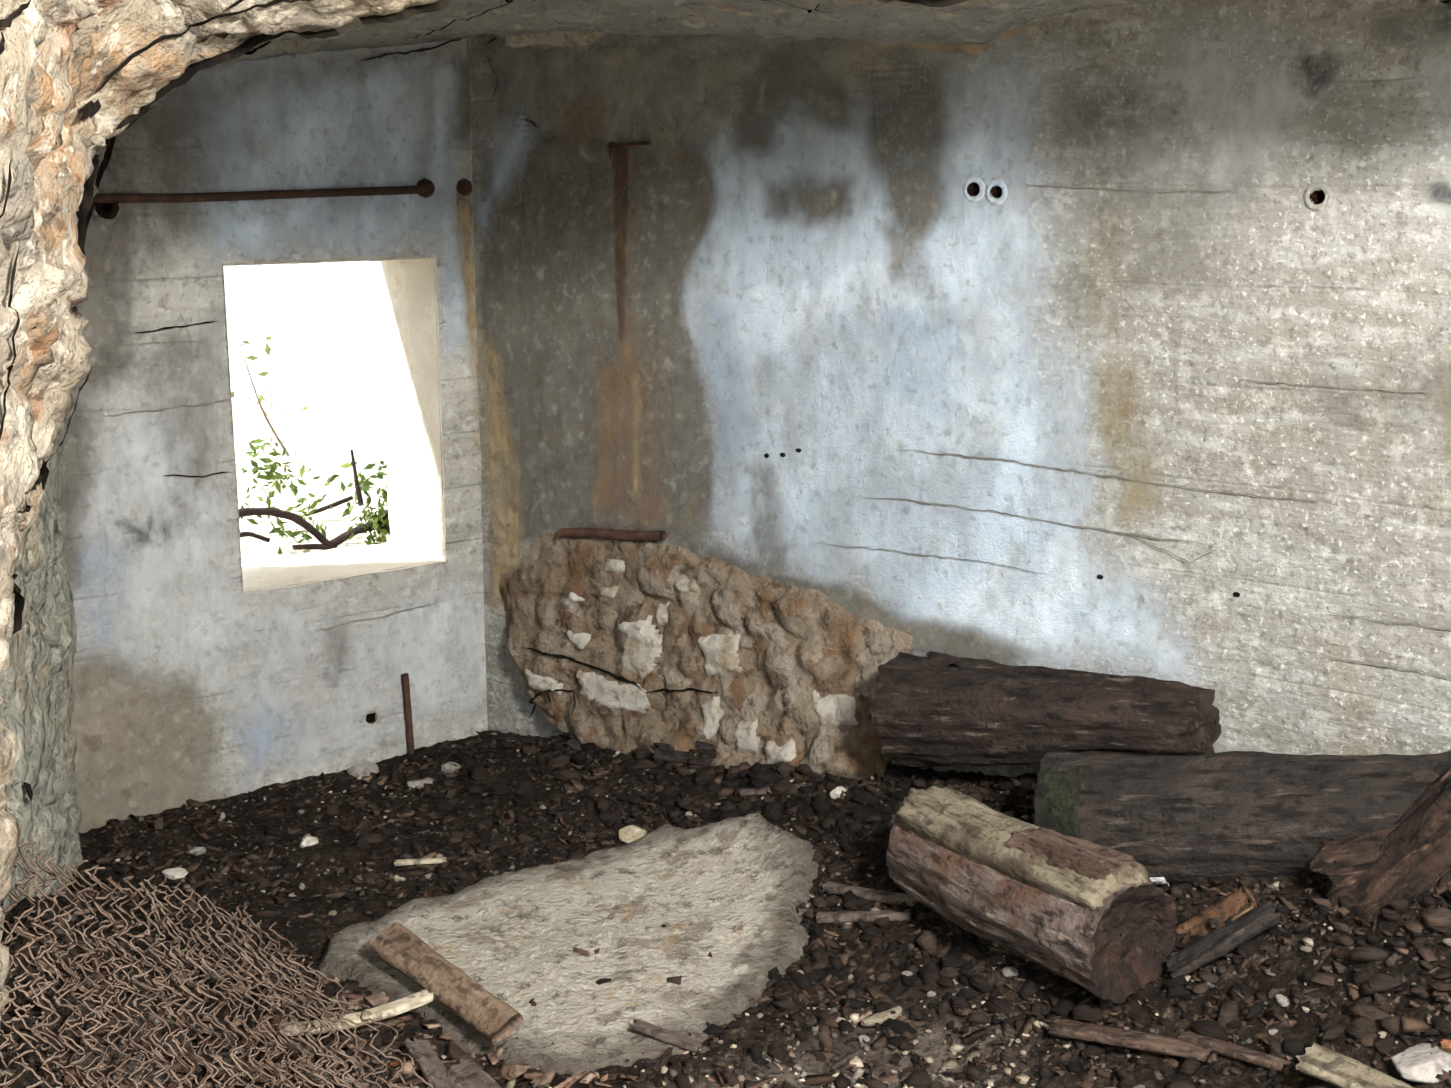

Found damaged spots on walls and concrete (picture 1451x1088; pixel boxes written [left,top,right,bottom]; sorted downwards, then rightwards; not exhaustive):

crack [877,0,968,8]
crack [76,0,535,255]
damp [194,55,471,248]
crack [0,158,20,439]
crack [22,366,228,514]
crack [134,321,217,333]
corrosion [458,198,521,603]
corrosion [614,147,629,360]
damp [450,39,1171,668]
crack [12,574,25,634]
crack [311,600,447,633]
crack [521,647,719,719]